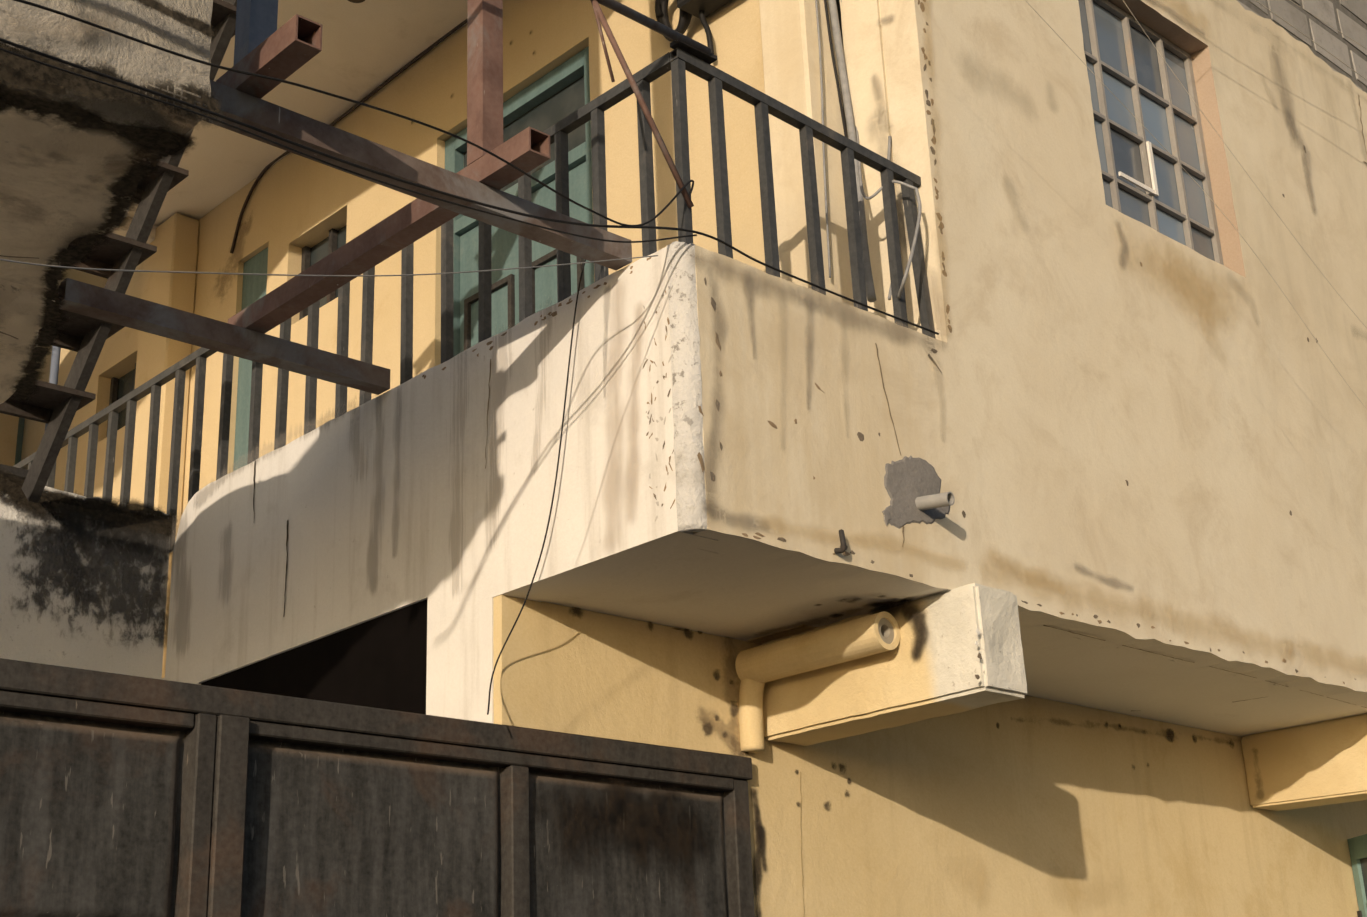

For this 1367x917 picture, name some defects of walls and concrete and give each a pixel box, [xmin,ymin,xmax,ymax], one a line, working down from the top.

peeling [882,505,891,526]
water stain [816,595,927,659]
water stain [703,702,738,737]